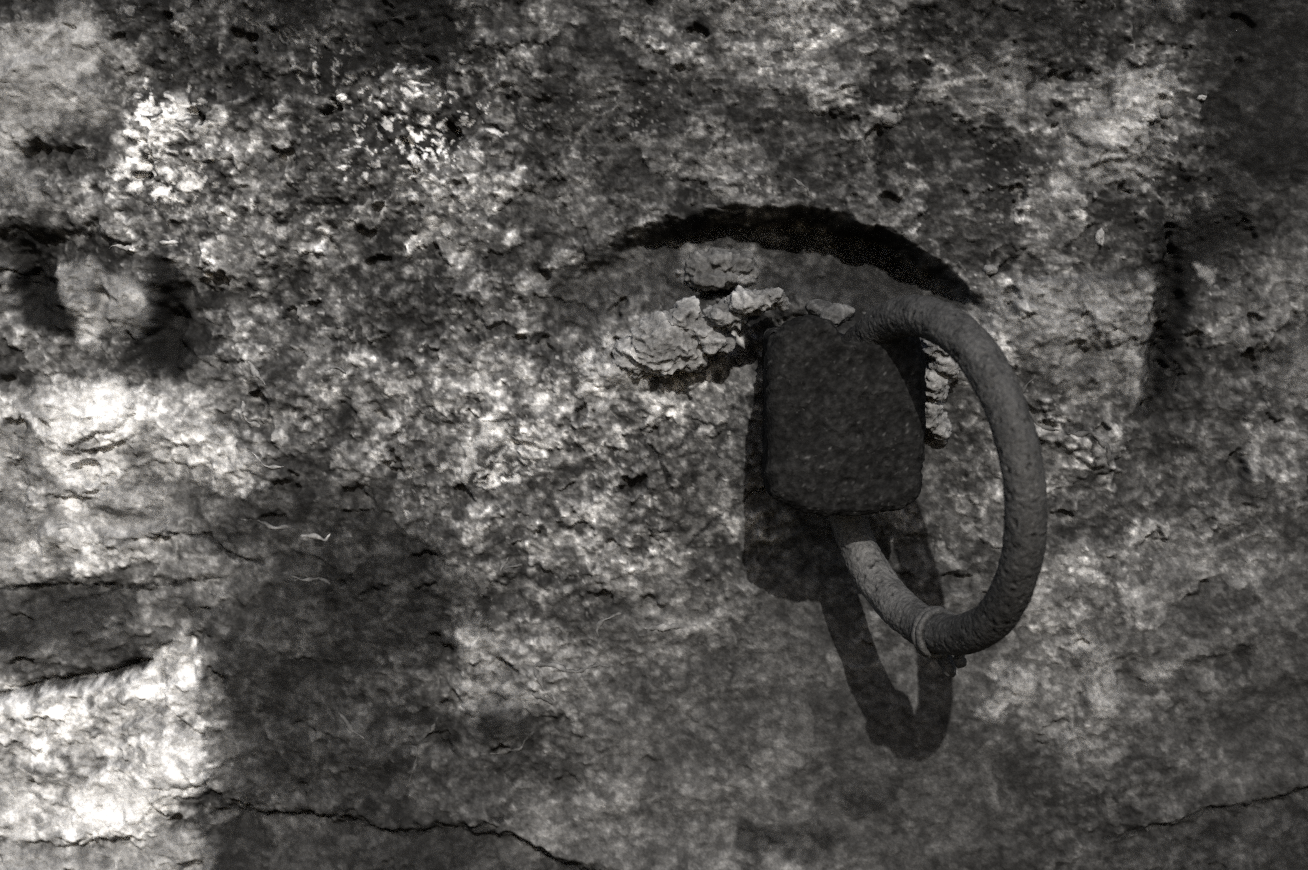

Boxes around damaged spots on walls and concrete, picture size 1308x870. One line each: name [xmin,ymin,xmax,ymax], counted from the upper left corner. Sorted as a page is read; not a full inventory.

spalling [550,204,973,325]
crack [201,772,594,870]
crack [1102,787,1308,840]